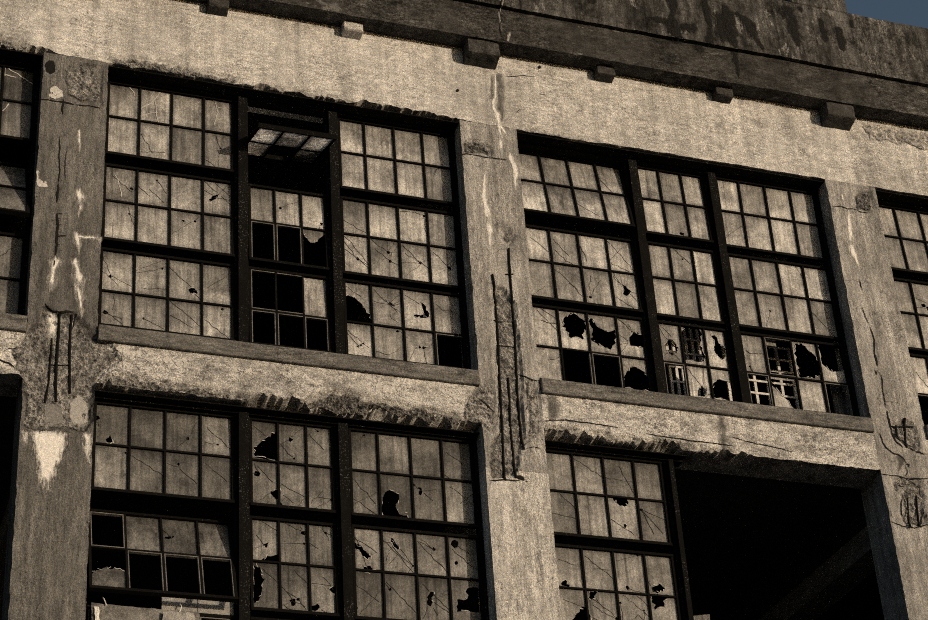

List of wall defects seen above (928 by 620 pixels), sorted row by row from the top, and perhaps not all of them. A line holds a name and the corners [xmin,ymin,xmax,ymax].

leakage [648,0,764,76]
leakage [782,6,803,46]
leakage [818,18,854,52]
spalling [5,310,251,431]
spalling [308,231,540,481]
spalling [891,418,914,448]
spalling [894,478,924,528]